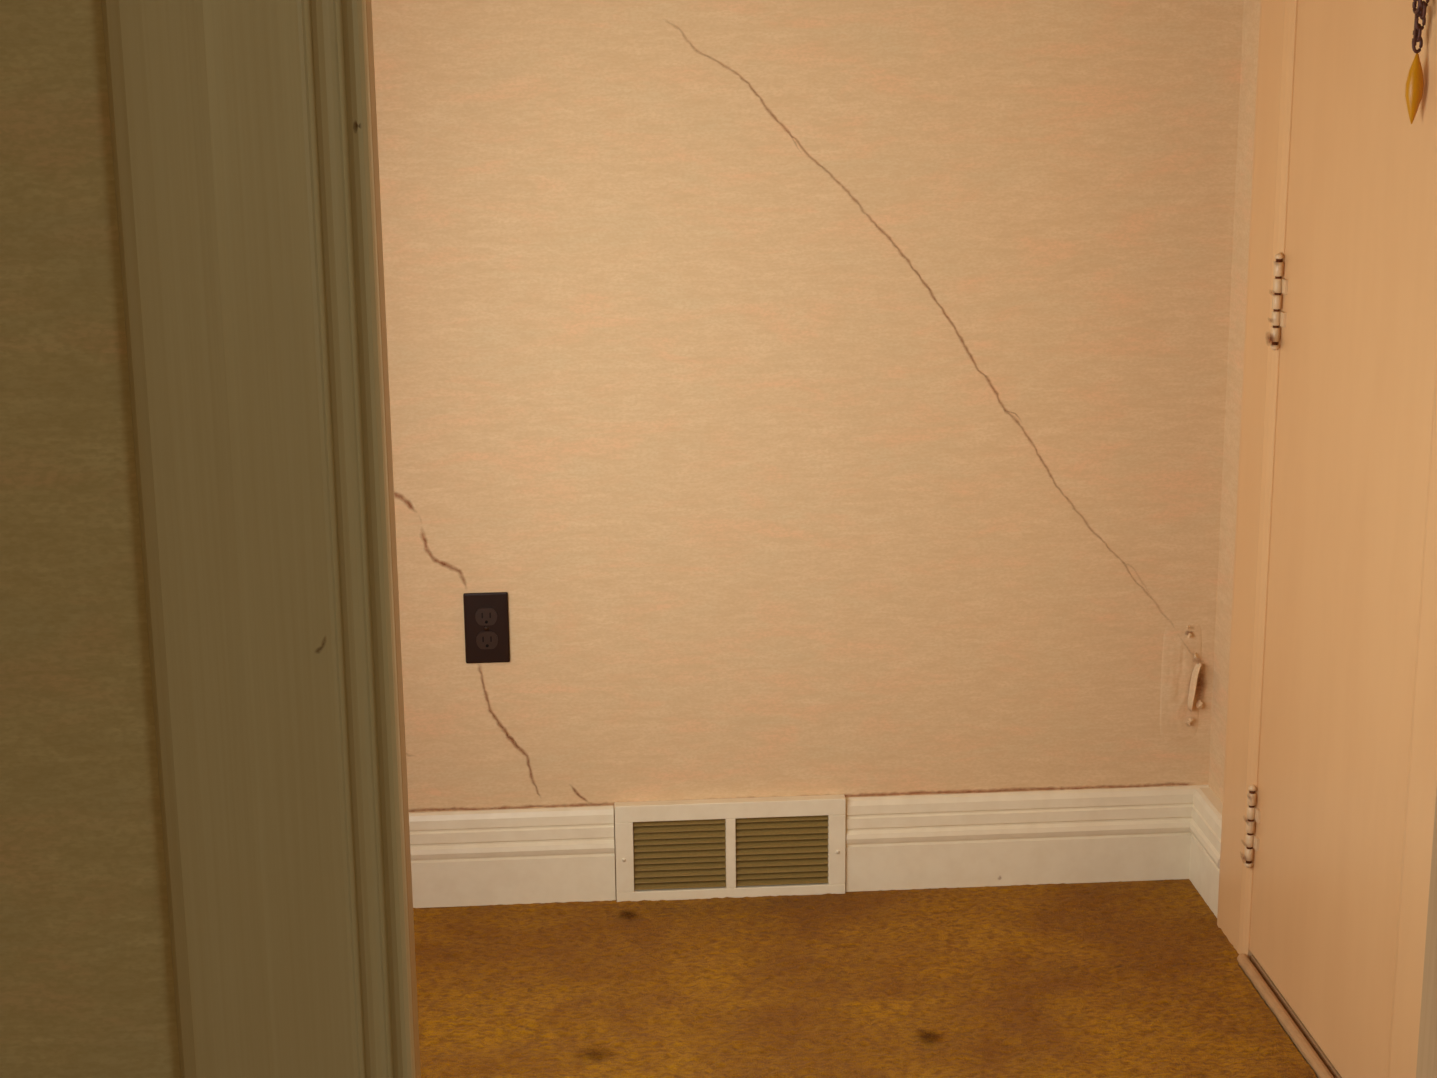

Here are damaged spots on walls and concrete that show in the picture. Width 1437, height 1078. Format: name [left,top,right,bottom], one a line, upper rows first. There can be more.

crack [412,681,601,811]